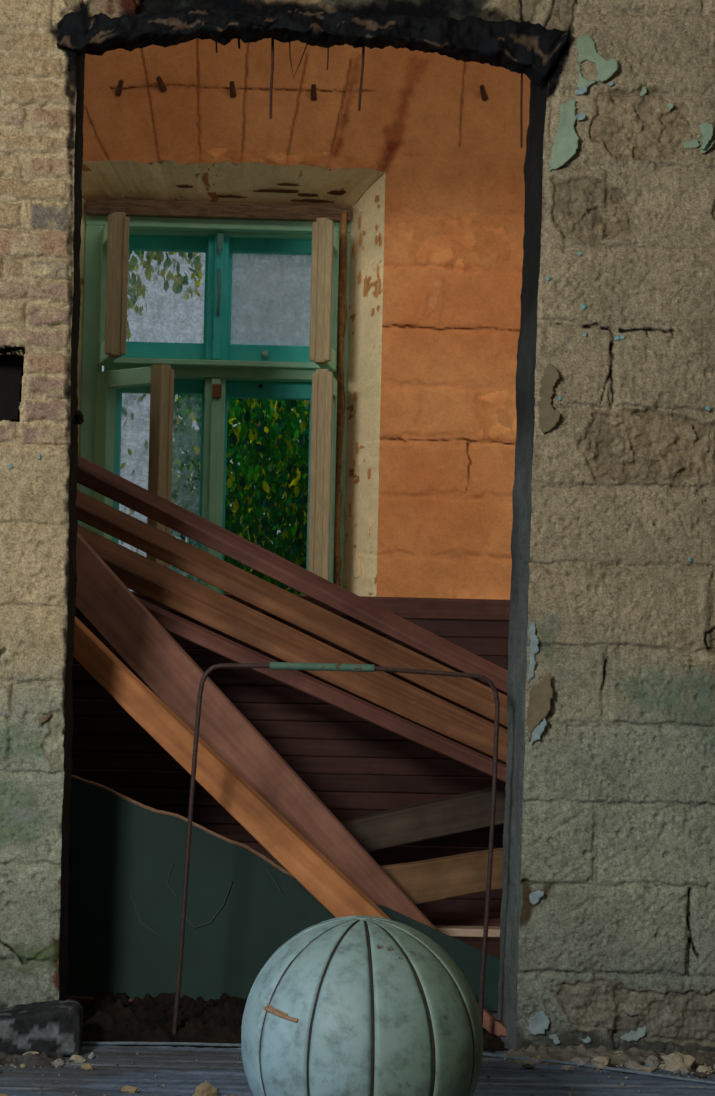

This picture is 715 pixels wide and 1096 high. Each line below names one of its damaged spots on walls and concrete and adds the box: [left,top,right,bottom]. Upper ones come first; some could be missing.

flaking render [548,35,715,247]
crack [557,322,673,407]
peeling [526,621,553,745]
crack [0,941,36,964]
crack [687,887,698,976]